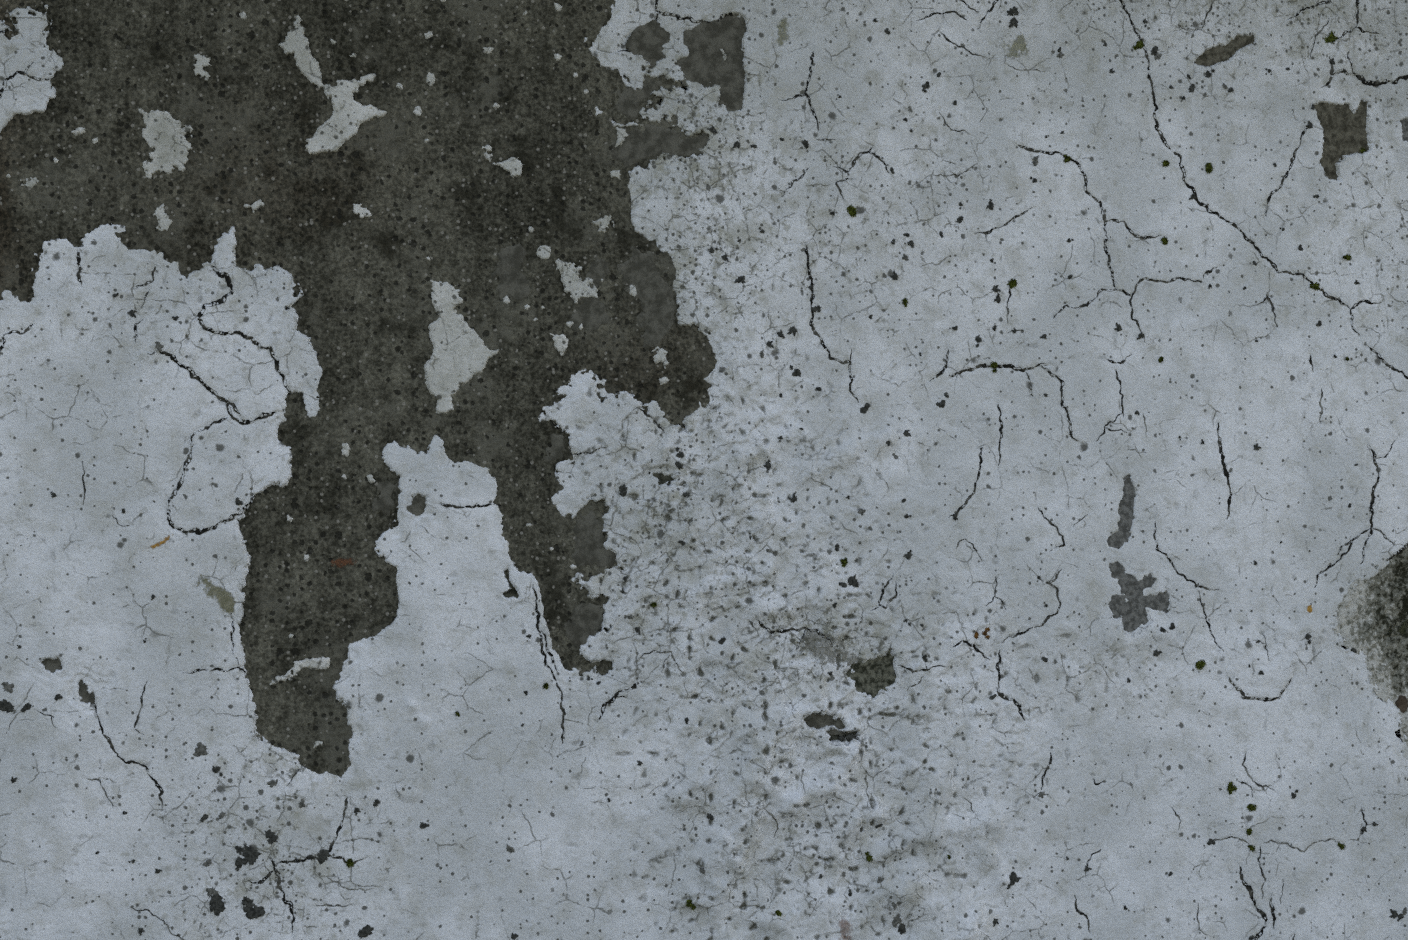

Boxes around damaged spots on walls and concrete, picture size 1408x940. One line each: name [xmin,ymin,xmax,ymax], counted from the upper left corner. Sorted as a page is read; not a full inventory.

peeling [1194,35,1255,67]
crack [1119,0,1408,379]
peeling [1314,100,1369,180]
crack [133,266,291,535]
peeling [0,0,747,778]
crack [805,245,859,403]
crack [900,112,1217,721]
peeling [1107,474,1170,632]
crack [1153,523,1294,702]
crack [1217,423,1232,519]
crack [1315,443,1408,587]
crack [1214,807,1374,940]